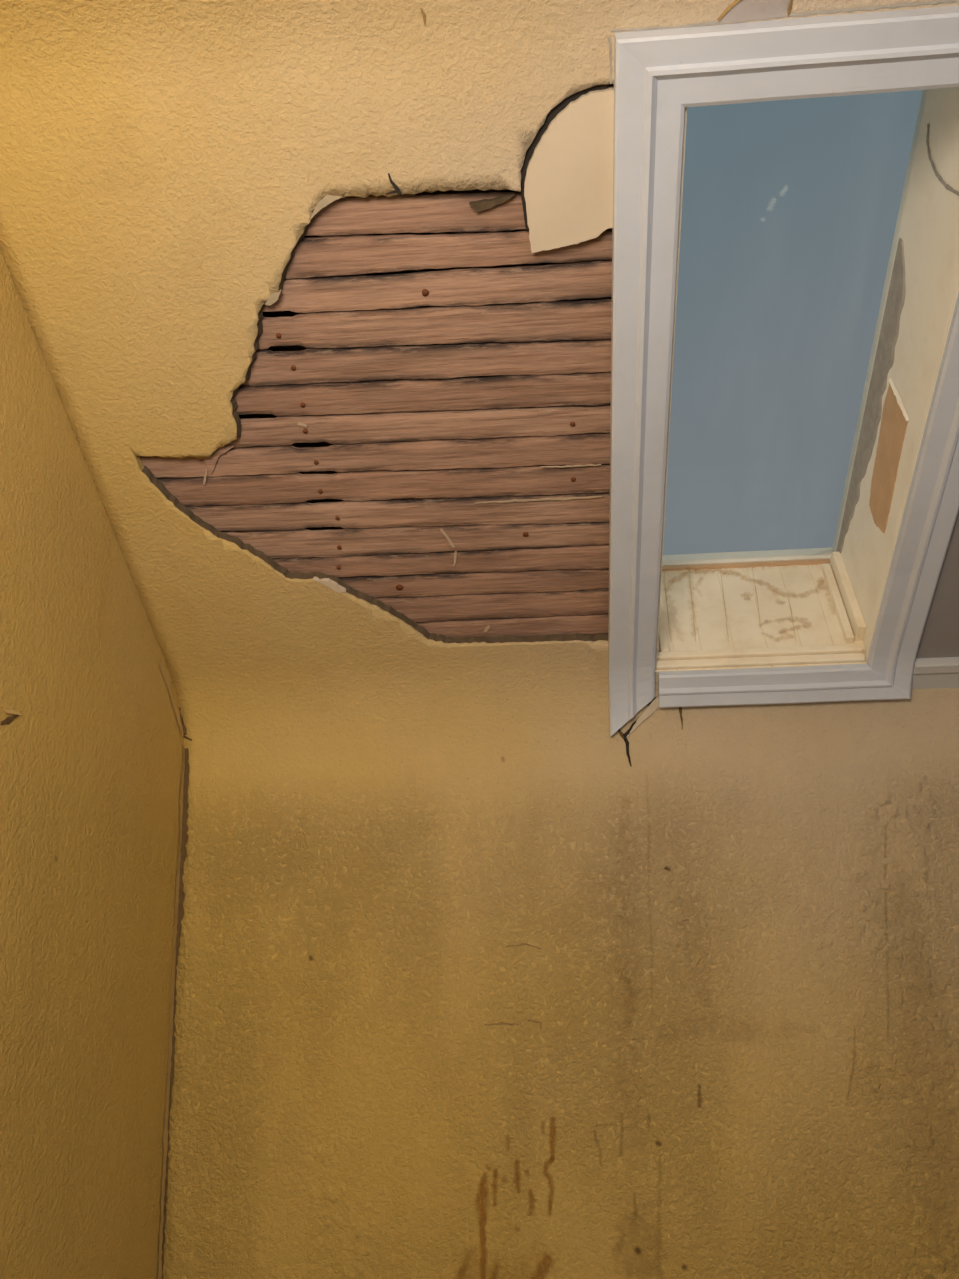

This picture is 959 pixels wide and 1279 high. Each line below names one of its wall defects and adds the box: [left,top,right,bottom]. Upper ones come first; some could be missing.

spalling [386,173,422,195]
crack [521,0,959,230]
spalling [204,195,342,474]
spalling [142,466,608,643]
crack [618,695,683,767]